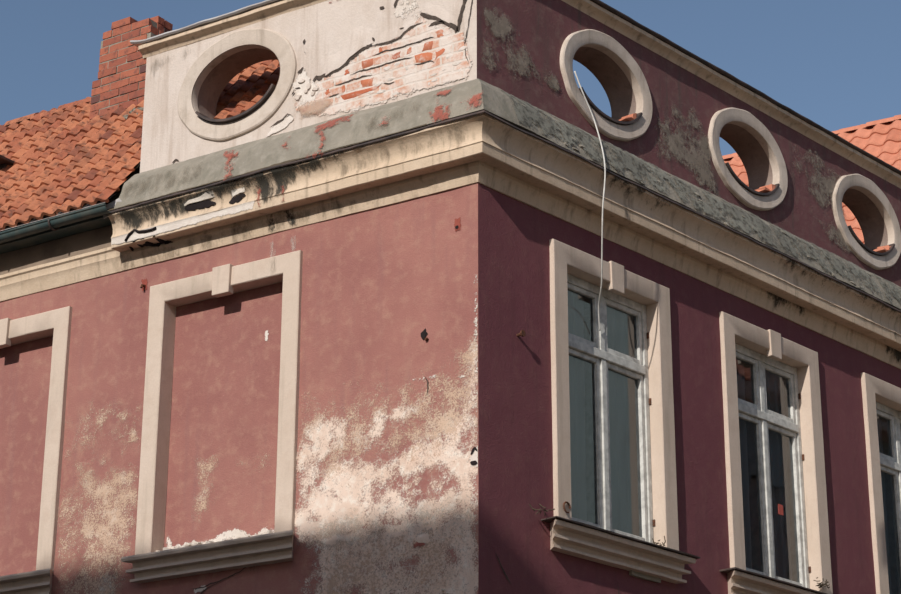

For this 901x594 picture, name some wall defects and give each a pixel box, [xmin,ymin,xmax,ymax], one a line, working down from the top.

crack [313,0,472,81]
spalling [267,0,560,136]
spalling [111,187,255,247]
leakage [111,114,353,229]
leakage [502,90,901,314]
leakage [885,332,901,362]
peeling [67,405,139,455]
peeling [294,292,478,594]
peeling [57,460,139,594]
spalling [166,528,274,549]
crack [194,567,246,594]